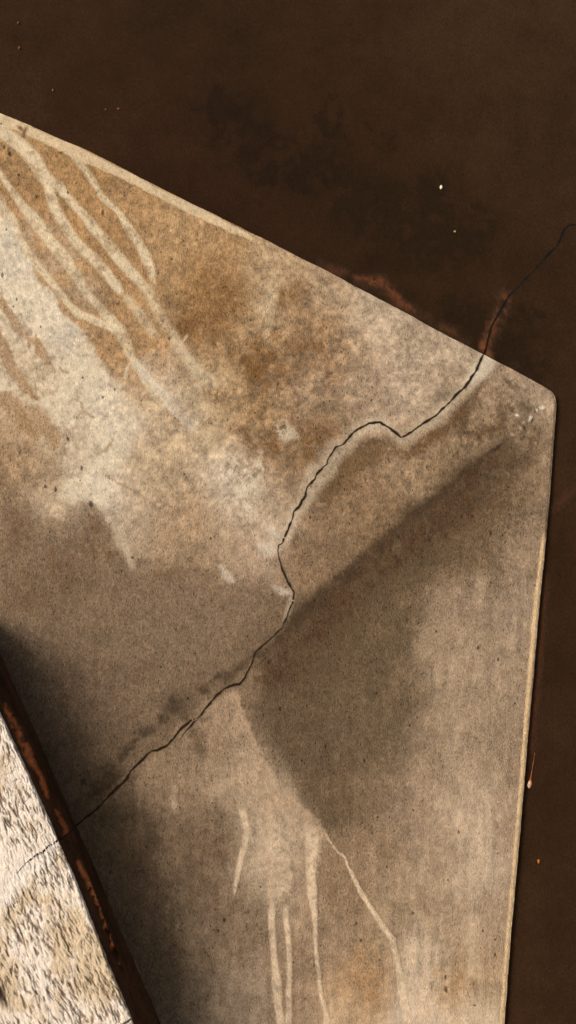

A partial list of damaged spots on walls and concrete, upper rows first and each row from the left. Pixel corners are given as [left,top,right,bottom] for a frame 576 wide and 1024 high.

damp [0,128,335,824]
crack [17,223,576,874]
damp [77,70,567,1024]
corrosion [316,256,512,360]